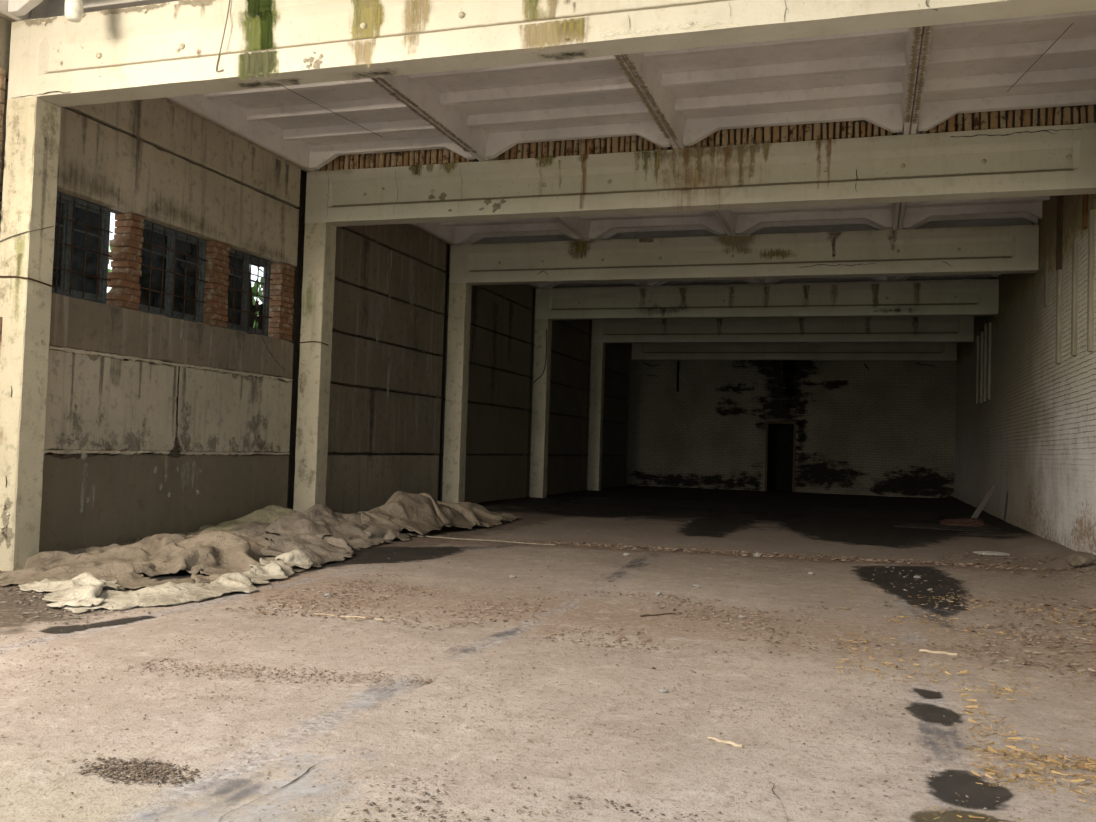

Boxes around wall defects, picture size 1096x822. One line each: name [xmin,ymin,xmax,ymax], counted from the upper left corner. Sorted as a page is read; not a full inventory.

leakage [242,0,279,51]
leakage [351,0,391,77]
leakage [405,0,429,42]
leakage [520,0,585,59]
corrosion [614,54,771,191]
leakage [788,419,954,498]
spalling [0,497,13,548]
crack [219,765,315,822]